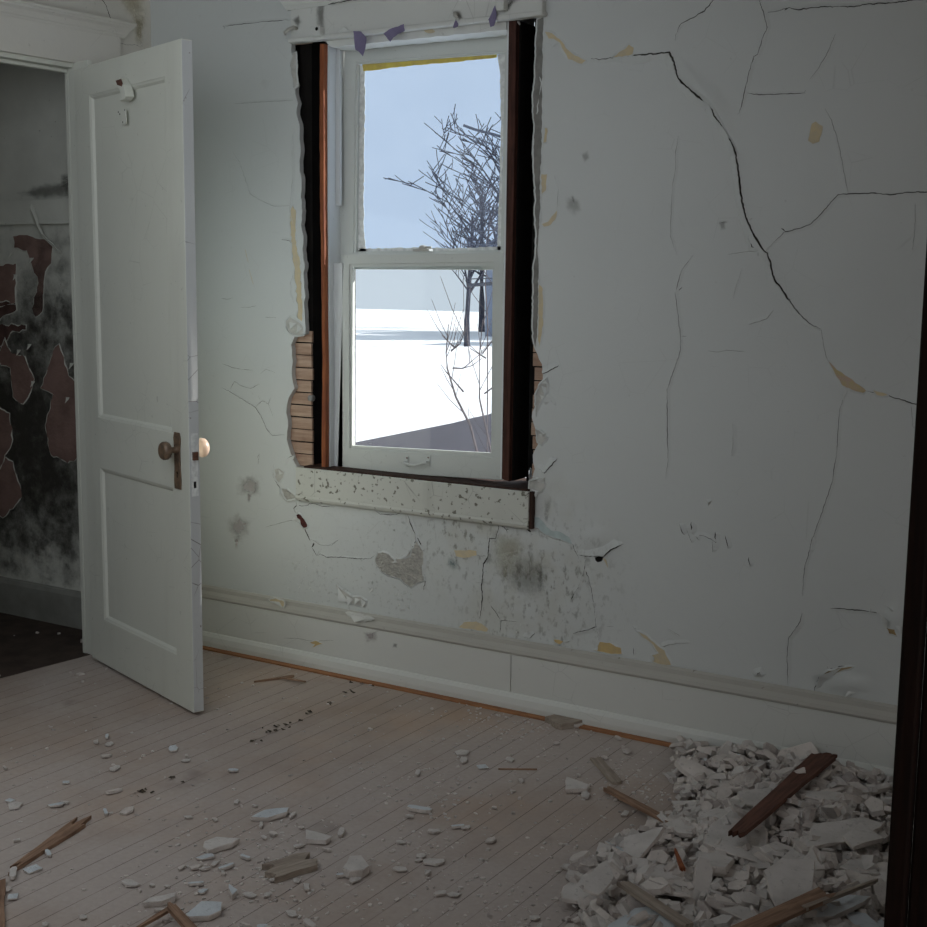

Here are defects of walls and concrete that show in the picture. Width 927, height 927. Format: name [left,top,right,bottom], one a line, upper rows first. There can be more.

spalling [290,51,299,90]
spalling [531,17,587,349]
crack [591,0,927,358]
peeling [0,233,54,318]
spalling [285,204,305,337]
crack [665,136,694,479]
peeling [0,337,77,463]
damp [0,295,79,557]
spalling [374,542,425,589]
crack [480,526,517,632]
crack [577,539,623,557]
crack [787,399,845,685]